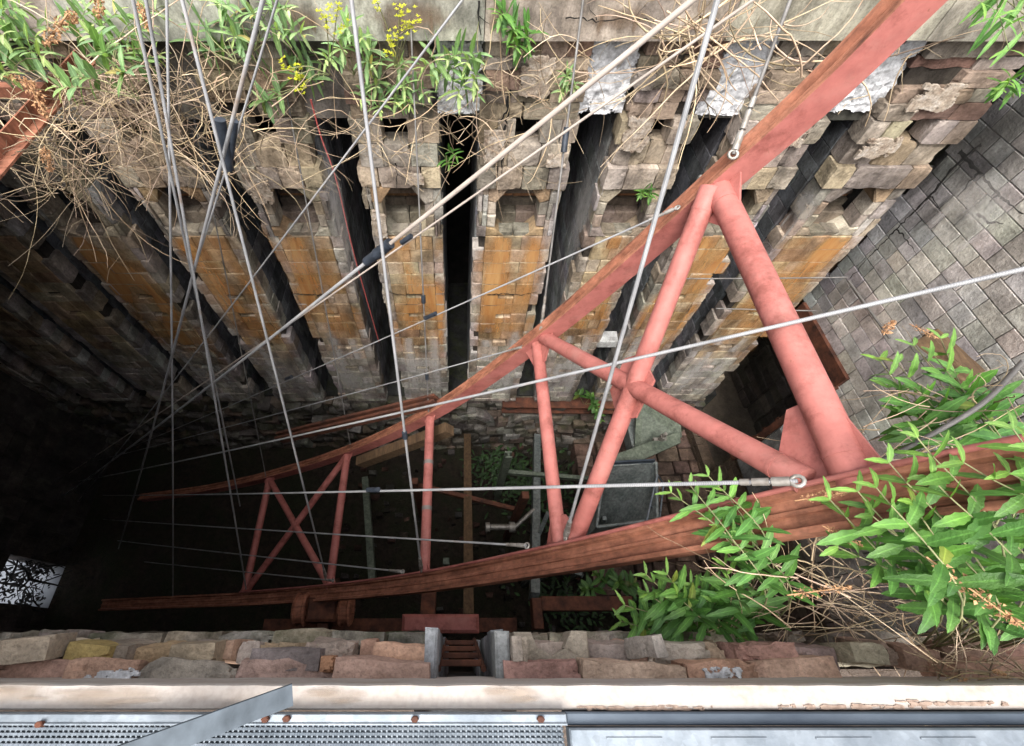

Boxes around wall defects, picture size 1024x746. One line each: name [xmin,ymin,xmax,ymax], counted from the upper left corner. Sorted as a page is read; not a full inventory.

flaking render [694,41,779,116]
flaking render [830,41,928,113]
spalling [904,83,969,113]
spalling [852,136,904,160]
peeling [777,700,1009,710]